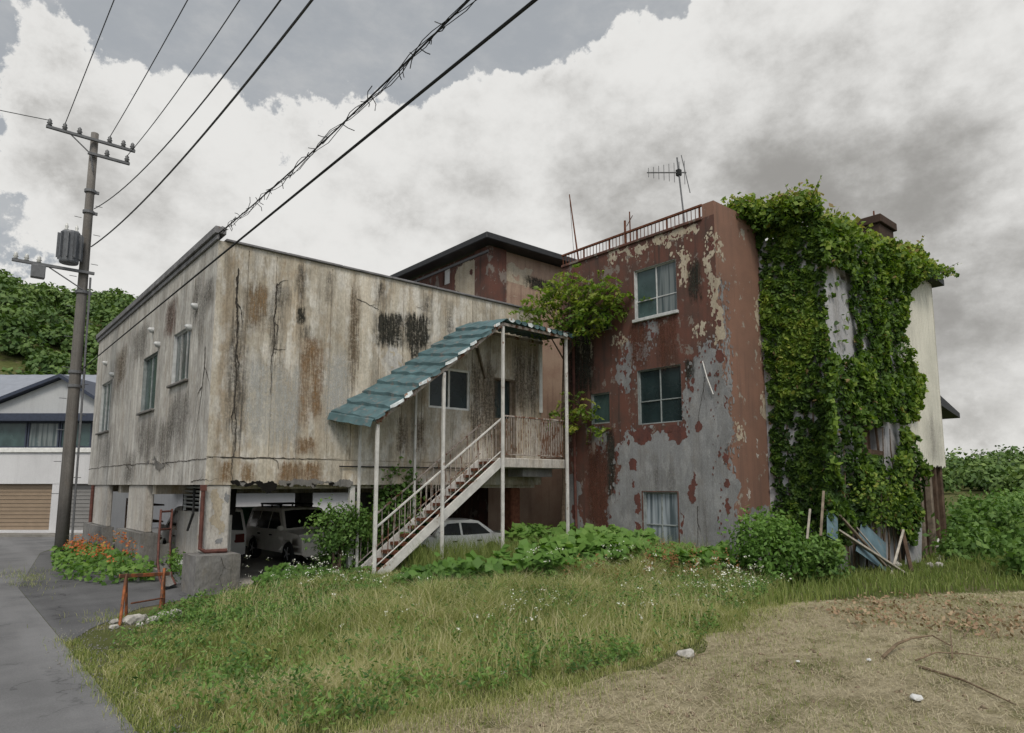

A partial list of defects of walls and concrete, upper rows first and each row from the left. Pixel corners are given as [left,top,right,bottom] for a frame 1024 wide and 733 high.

crack [89,268,338,482]
rust [301,341,323,420]
mould [378,313,430,359]
peeling [594,223,771,564]
peeling [199,478,353,544]